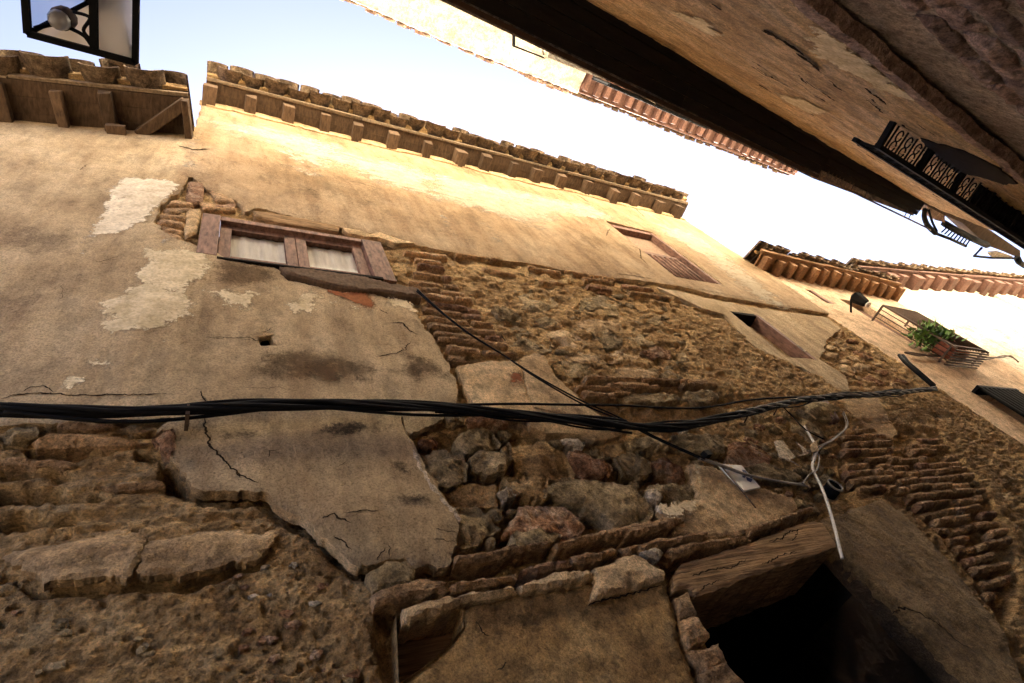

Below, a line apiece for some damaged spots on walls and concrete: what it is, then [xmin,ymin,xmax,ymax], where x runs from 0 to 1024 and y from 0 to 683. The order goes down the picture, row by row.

peeling [80,177,281,342]
peeling [286,291,337,314]
spalling [388,250,719,411]
leakage [263,351,372,382]
spalling [821,333,910,400]
spalling [0,421,176,482]
crack [200,391,261,484]
spalling [98,480,166,495]
crack [323,509,377,550]
spalling [364,400,1013,644]
spalling [671,592,744,683]